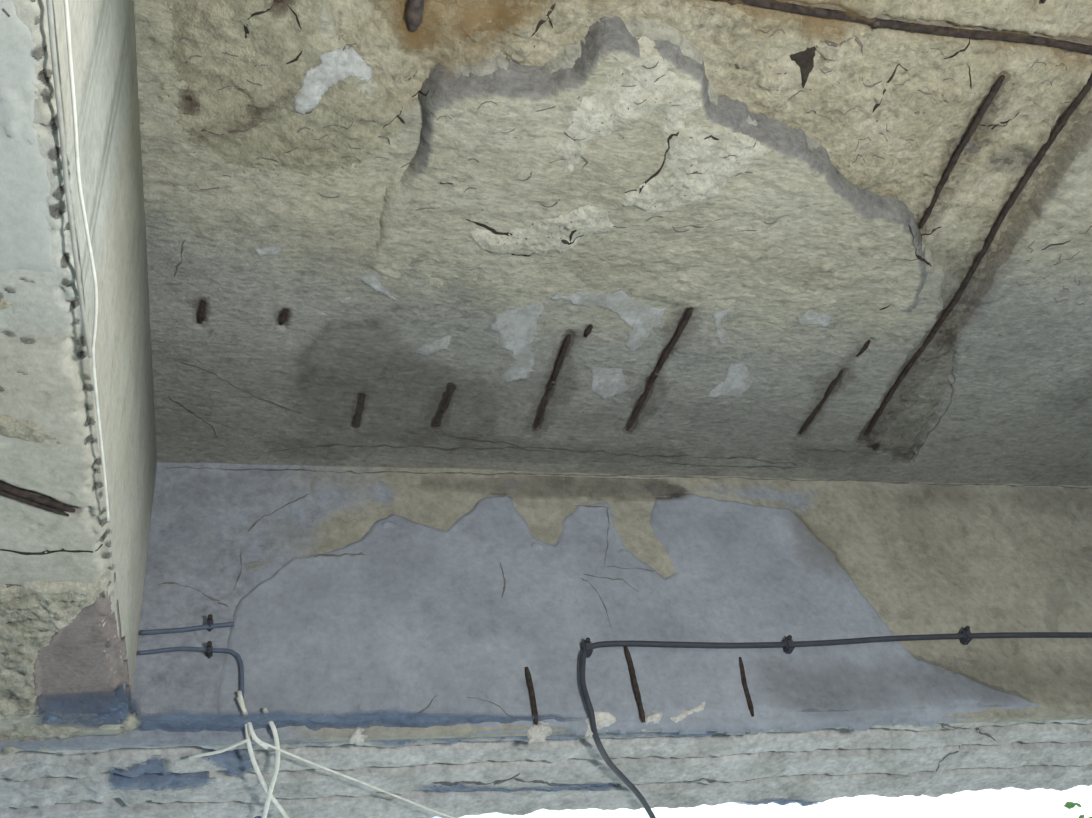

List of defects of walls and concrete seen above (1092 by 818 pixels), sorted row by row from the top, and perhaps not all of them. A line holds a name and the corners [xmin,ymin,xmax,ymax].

spalling [33,46,52,101]
spalling [49,148,70,230]
spalling [148,0,1092,460]
spalling [62,253,80,323]
spalling [78,337,88,360]
spalling [85,406,96,444]
crack [0,544,103,555]
spalling [0,509,144,758]
spalling [525,667,552,744]
spalling [624,646,706,731]
spalling [739,657,754,717]